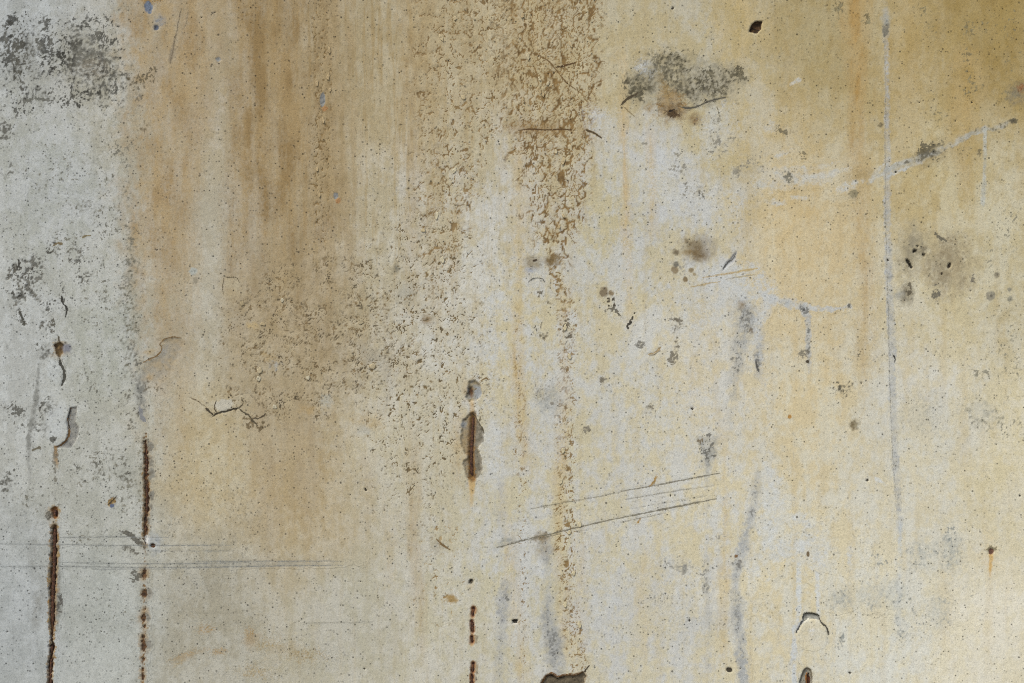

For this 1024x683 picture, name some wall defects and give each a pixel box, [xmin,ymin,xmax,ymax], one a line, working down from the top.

damp [332,0,414,252]
peeling [0,228,99,470]
corrosion [40,448,68,683]
corrosion [123,555,156,683]
corrosion [132,432,159,536]
damp [0,0,365,660]
crack [189,397,271,436]
peeling [180,0,621,683]
corrosion [467,582,480,683]
damp [475,0,1024,683]